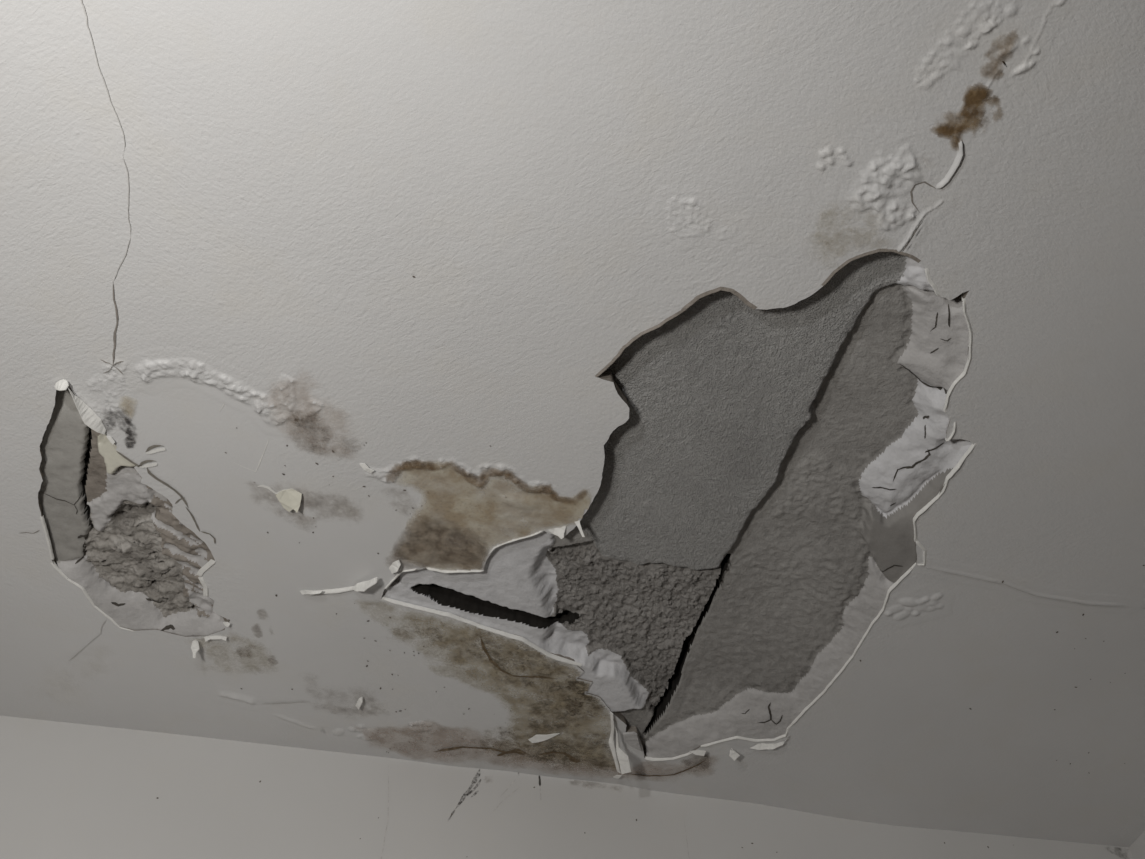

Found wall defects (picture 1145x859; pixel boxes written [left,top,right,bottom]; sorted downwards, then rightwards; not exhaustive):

crack [80,0,131,373]
rust [935,38,1012,148]
flaking render [38,346,334,658]
damp [390,460,590,569]
flaking render [300,249,977,779]
damp [370,617,707,800]